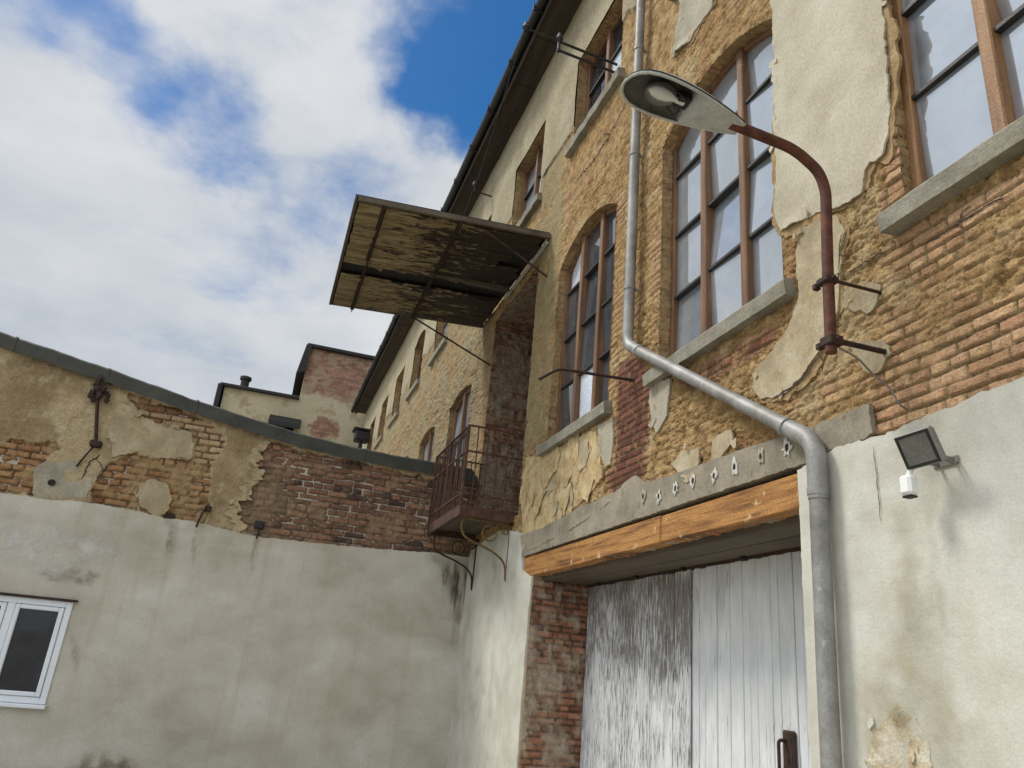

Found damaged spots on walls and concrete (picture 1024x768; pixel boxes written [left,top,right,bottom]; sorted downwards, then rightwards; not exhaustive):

flaking render [671,0,717,58]
flaking render [678,0,906,404]
flaking render [0,439,59,500]
flaking render [91,393,225,524]
flaking render [224,438,476,557]
flaking render [519,358,738,534]
flaking render [864,704,933,768]